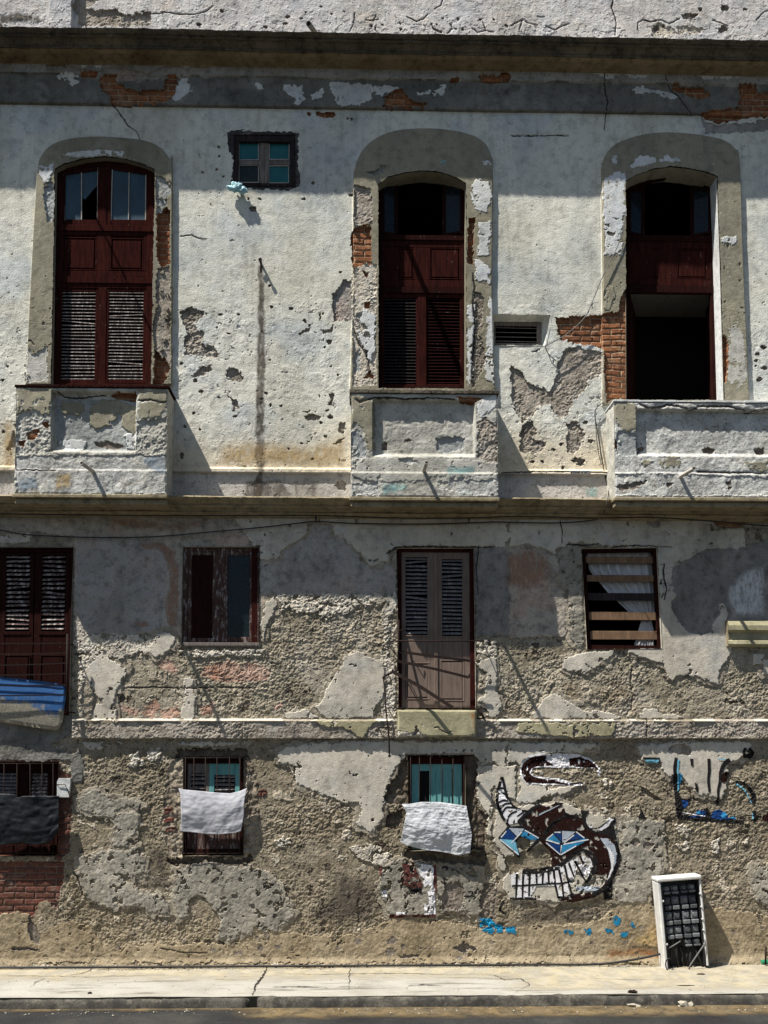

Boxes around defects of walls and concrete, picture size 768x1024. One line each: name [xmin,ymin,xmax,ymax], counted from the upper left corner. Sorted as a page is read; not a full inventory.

crack [407,0,568,33]
crack [611,0,679,32]
crack [602,74,610,130]
spalling [6,306,230,495]
leakage [225,266,339,496]
spalling [299,165,498,497]
spalling [509,285,637,463]
spalling [615,446,768,498]
peeling [232,518,748,688]
peeling [0,592,694,965]
peeling [632,735,759,801]
peeling [704,859,768,965]